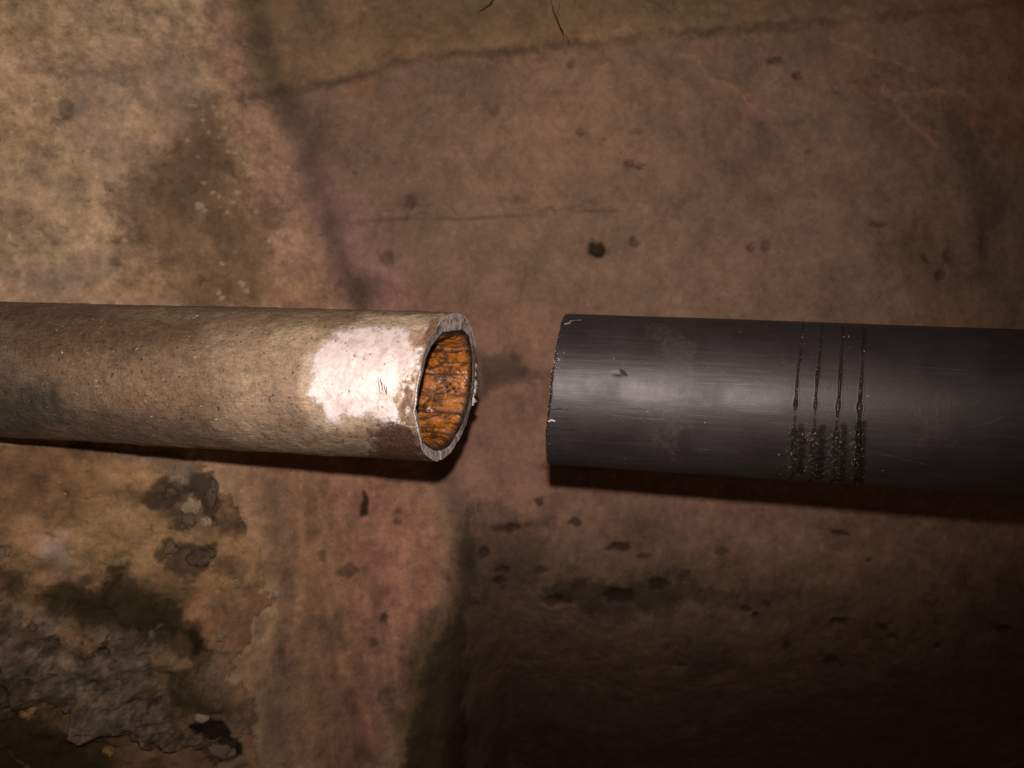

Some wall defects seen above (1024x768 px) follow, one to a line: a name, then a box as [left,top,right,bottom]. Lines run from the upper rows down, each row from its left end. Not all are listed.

crack [550,0,569,46]
spalling [0,441,274,768]